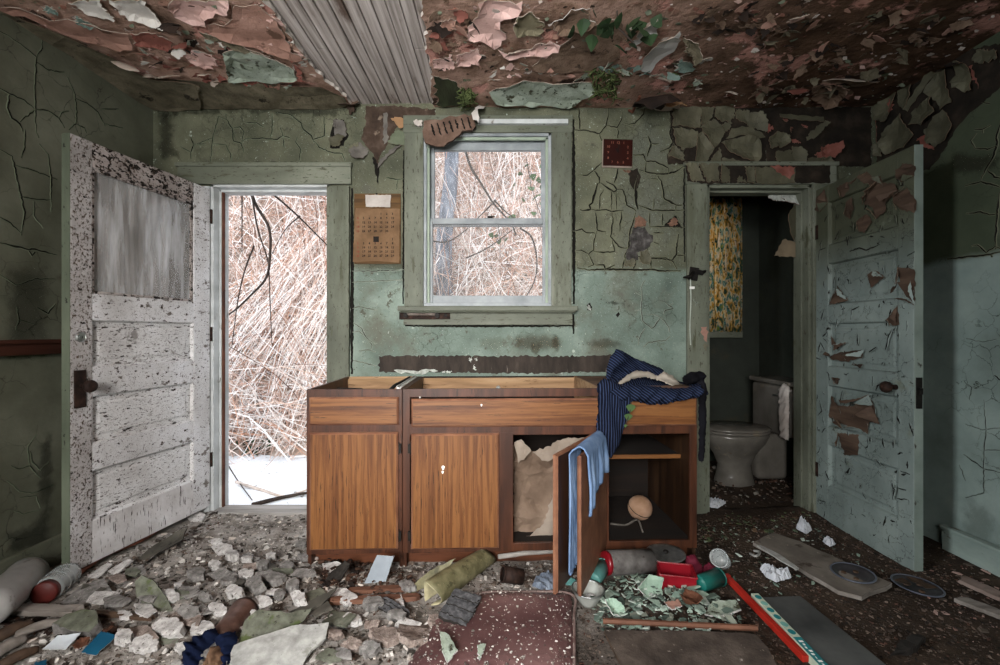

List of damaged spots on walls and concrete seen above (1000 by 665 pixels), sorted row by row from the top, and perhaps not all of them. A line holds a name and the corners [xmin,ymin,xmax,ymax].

crack [0,31,123,330]
crack [180,112,345,162]
peeling [0,0,1000,257]
crack [386,108,690,347]
flaking render [624,215,653,267]
crack [947,123,1000,260]
crack [959,375,1000,499]